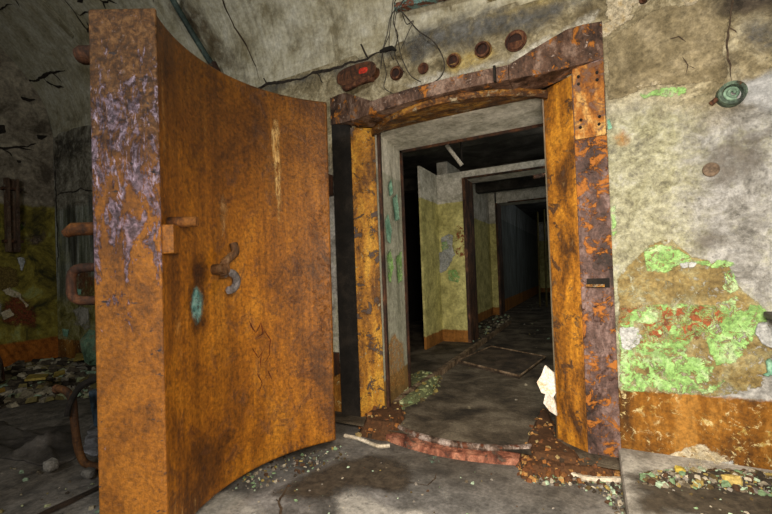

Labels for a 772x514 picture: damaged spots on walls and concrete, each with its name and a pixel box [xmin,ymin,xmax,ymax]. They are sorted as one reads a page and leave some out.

crack [65,0,117,33]
flaking render [602,0,652,37]
crack [29,70,65,88]
crack [222,0,379,89]
rust [450,52,492,73]
crack [726,0,737,81]
crack [0,143,36,156]
crack [54,157,92,278]
peeling [617,239,772,397]